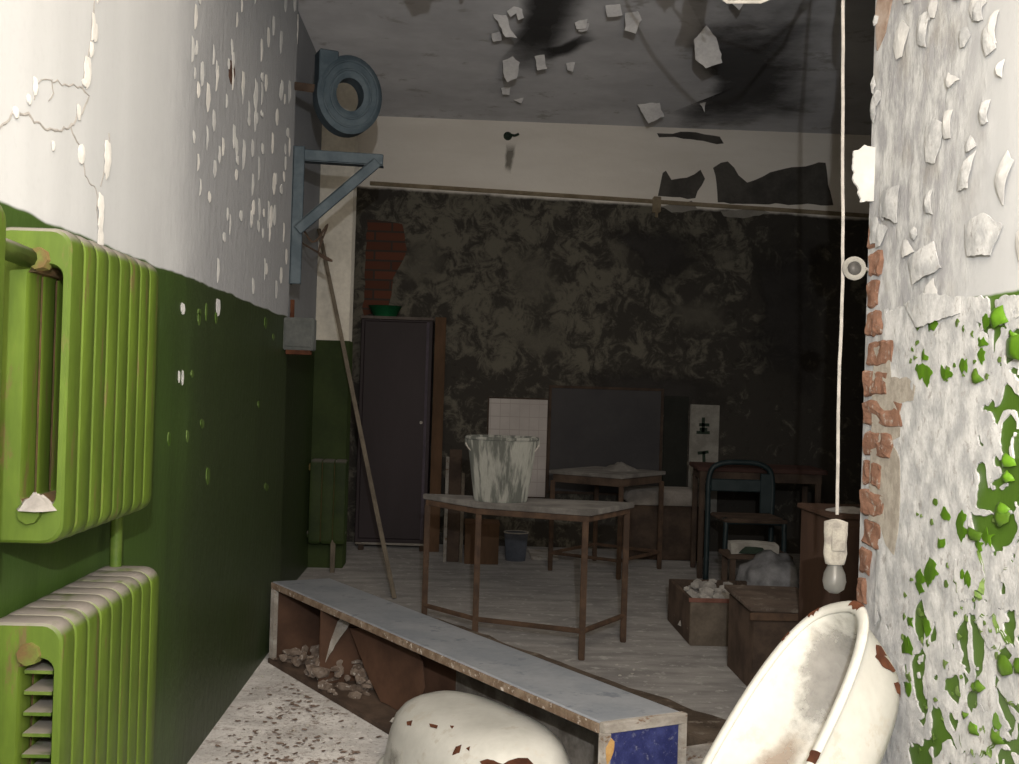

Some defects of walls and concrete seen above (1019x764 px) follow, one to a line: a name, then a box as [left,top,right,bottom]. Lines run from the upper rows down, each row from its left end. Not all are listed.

peeling [492,6,524,42]
peeling [605,4,642,34]
peeling [694,25,722,68]
flaking render [873,0,938,60]
crack [0,0,112,245]
peeling [191,0,291,298]
peeling [501,56,524,103]
peeling [657,132,723,144]
flaking render [870,75,881,123]
peeling [658,161,833,218]
spalling [198,299,221,325]
flaking render [852,145,1019,764]